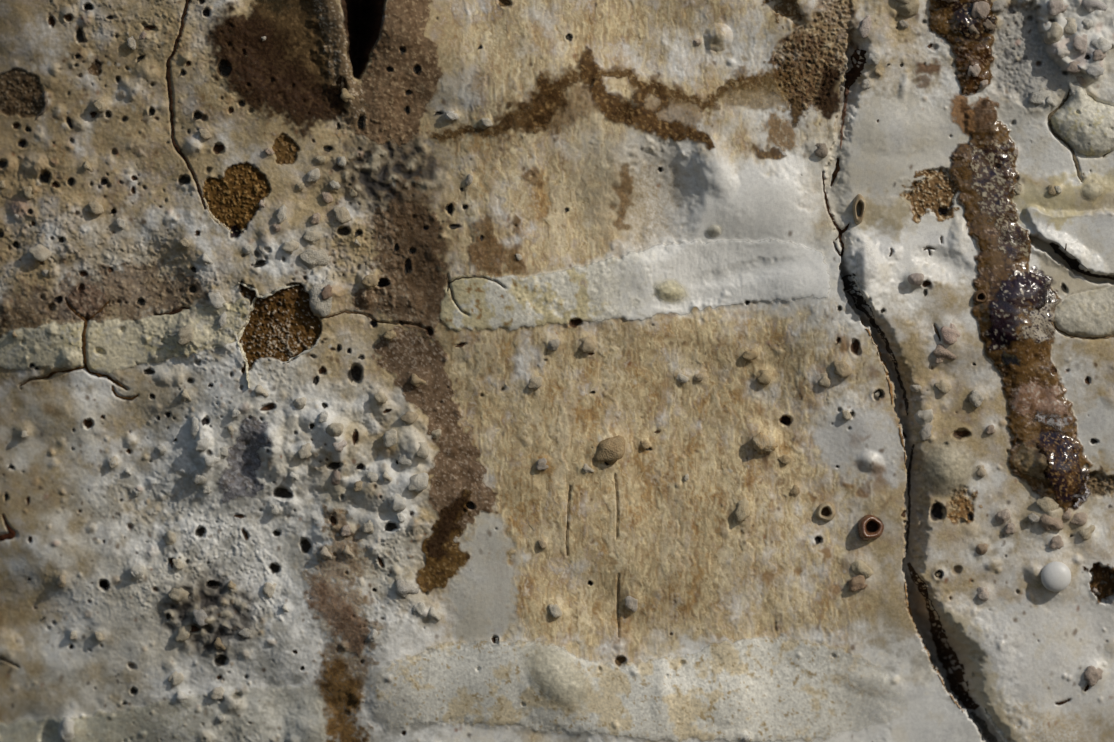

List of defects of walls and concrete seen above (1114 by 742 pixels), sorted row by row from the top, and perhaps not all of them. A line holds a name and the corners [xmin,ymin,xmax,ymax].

spalling [0,68,48,148]
crack [166,0,206,209]
rust [209,0,443,146]
rust [431,33,843,159]
rust [916,60,941,87]
rust [951,94,999,135]
spalling [179,162,270,238]
spalling [899,168,960,223]
crack [20,299,139,400]
spalling [237,281,321,388]
crack [822,48,1007,742]
damp [218,417,272,502]